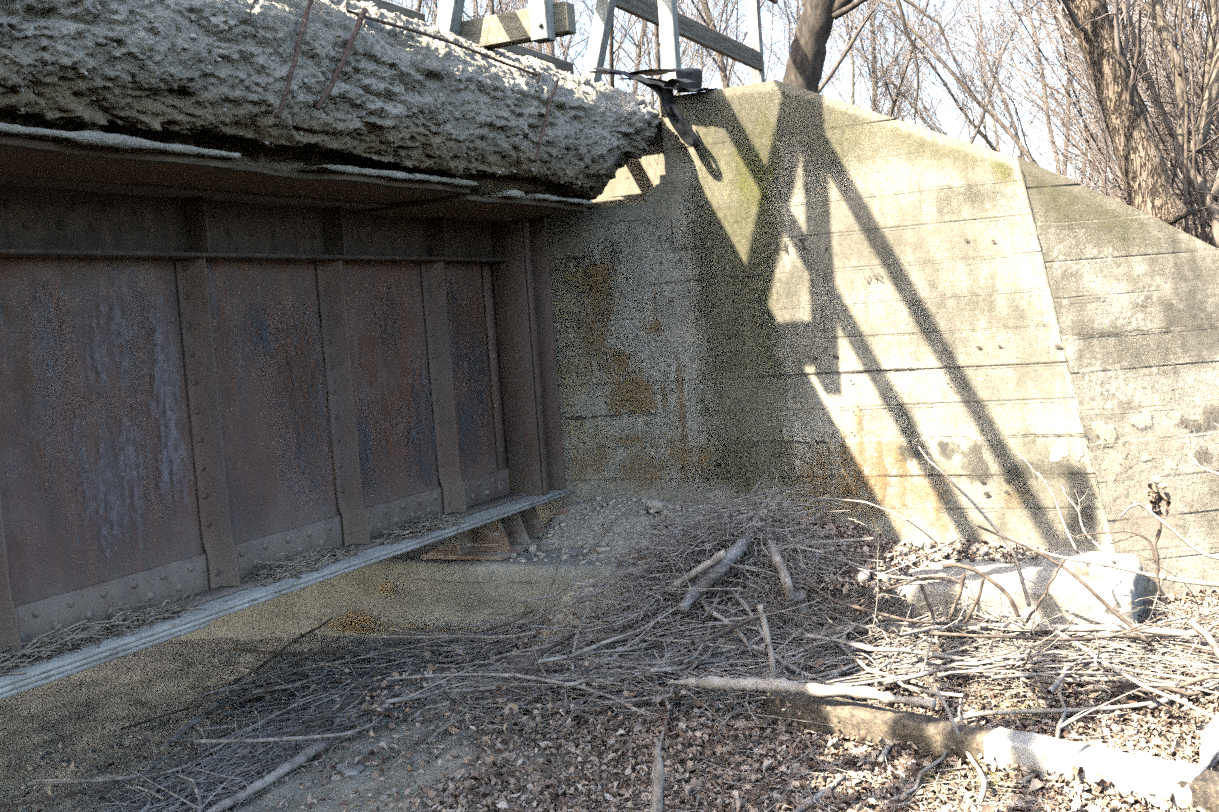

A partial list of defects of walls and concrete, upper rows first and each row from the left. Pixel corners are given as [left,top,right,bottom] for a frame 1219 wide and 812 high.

spalling [0,0,660,201]
corrosion [606,348,665,417]
peeling [1128,409,1151,428]
peeling [1048,419,1177,495]
corrosion [335,607,375,634]